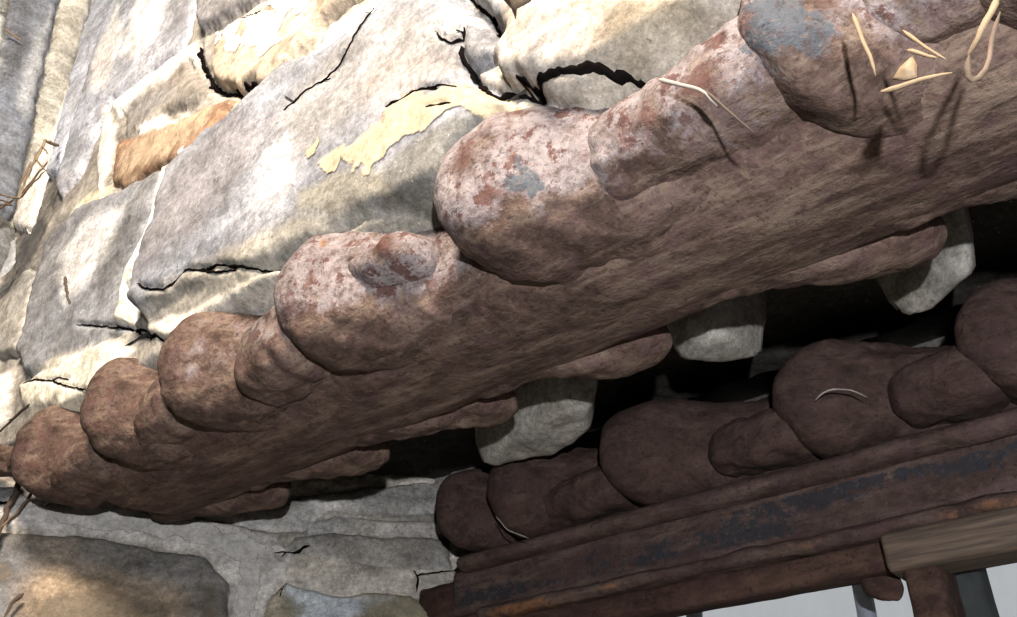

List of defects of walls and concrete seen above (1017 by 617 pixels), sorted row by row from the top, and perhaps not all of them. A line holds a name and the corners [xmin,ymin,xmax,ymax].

crack [197,47,258,100]
crack [283,7,375,111]
crack [385,0,646,108]
spalling [305,82,521,175]
crack [137,264,282,290]
crack [76,324,166,342]
rust [862,575,904,601]